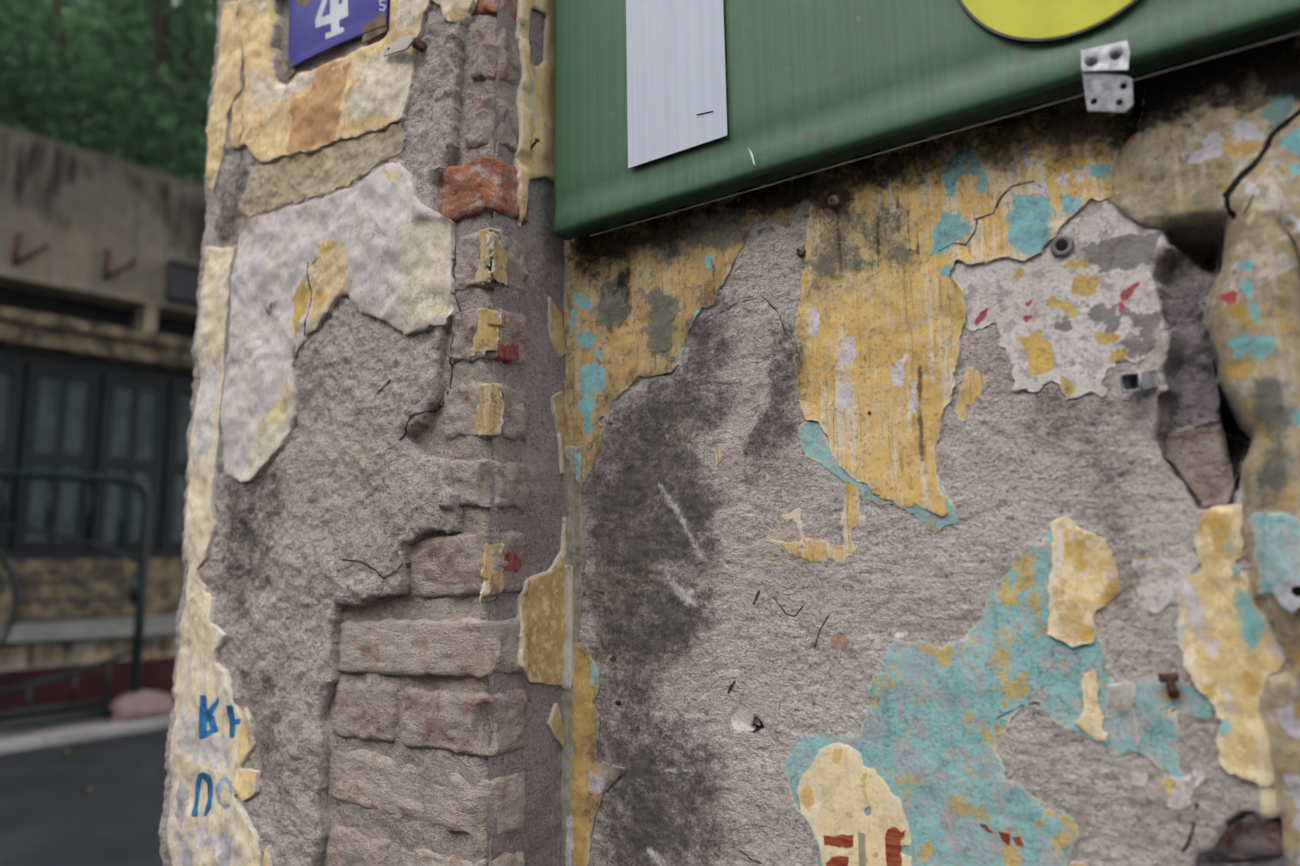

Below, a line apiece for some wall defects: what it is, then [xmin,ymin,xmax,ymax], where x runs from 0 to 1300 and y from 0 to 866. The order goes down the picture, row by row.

leakage [1,141,93,224]
leakage [157,155,245,259]
leakage [568,32,1300,333]
crack [1222,109,1300,219]
flaking render [158,0,797,866]
leakage [569,265,734,866]
leakage [743,327,804,460]
peeling [765,91,1287,866]